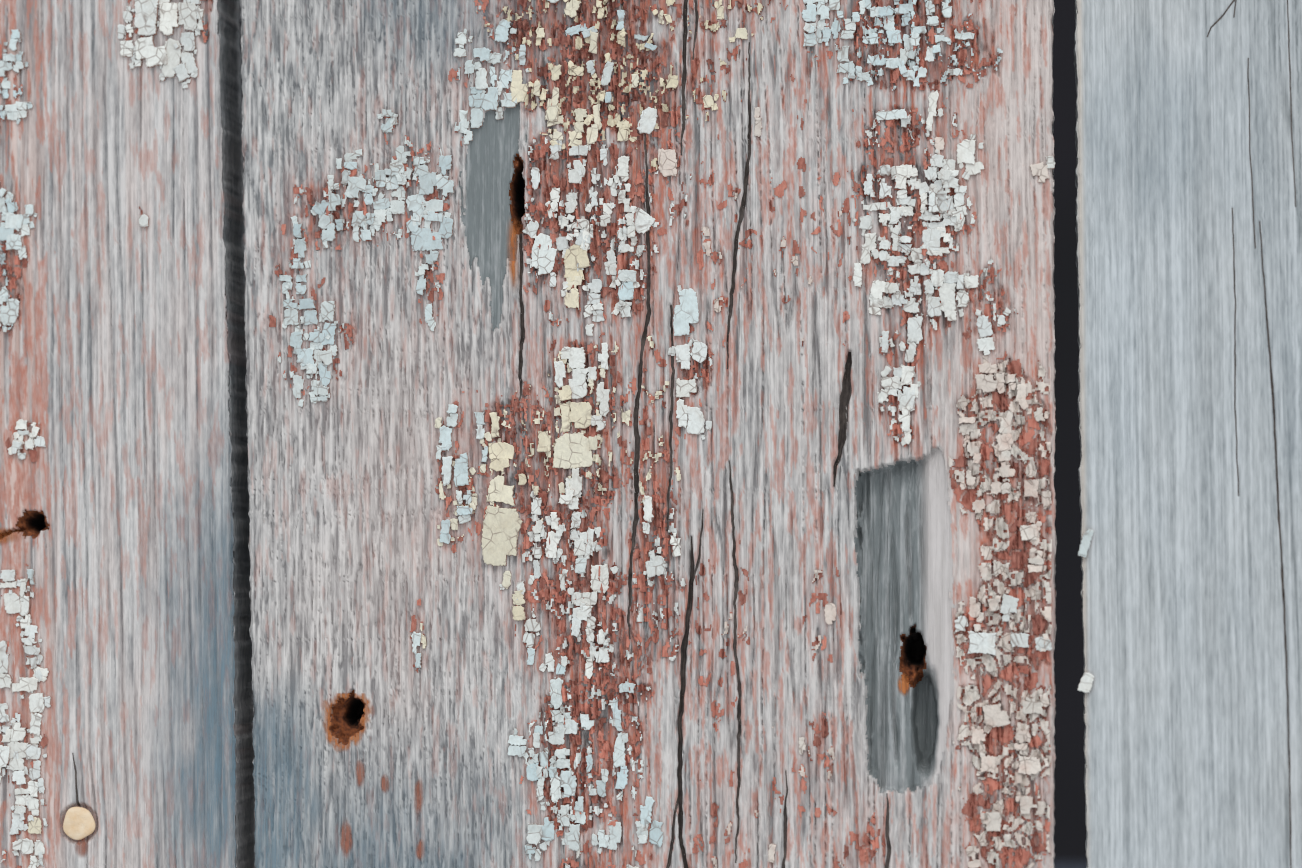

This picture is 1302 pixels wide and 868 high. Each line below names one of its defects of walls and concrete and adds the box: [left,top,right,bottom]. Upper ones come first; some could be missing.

peeling [0,29,33,127]
peeling [117,0,213,89]
crack [680,0,698,155]
peeling [0,182,38,335]
peeling [5,419,46,462]
peeling [269,0,1055,868]
crack [627,134,741,868]
peeling [0,563,51,868]
corrosion [325,693,370,749]
corrosion [898,674,909,694]
corrosion [356,763,364,785]
corrosion [341,824,352,854]